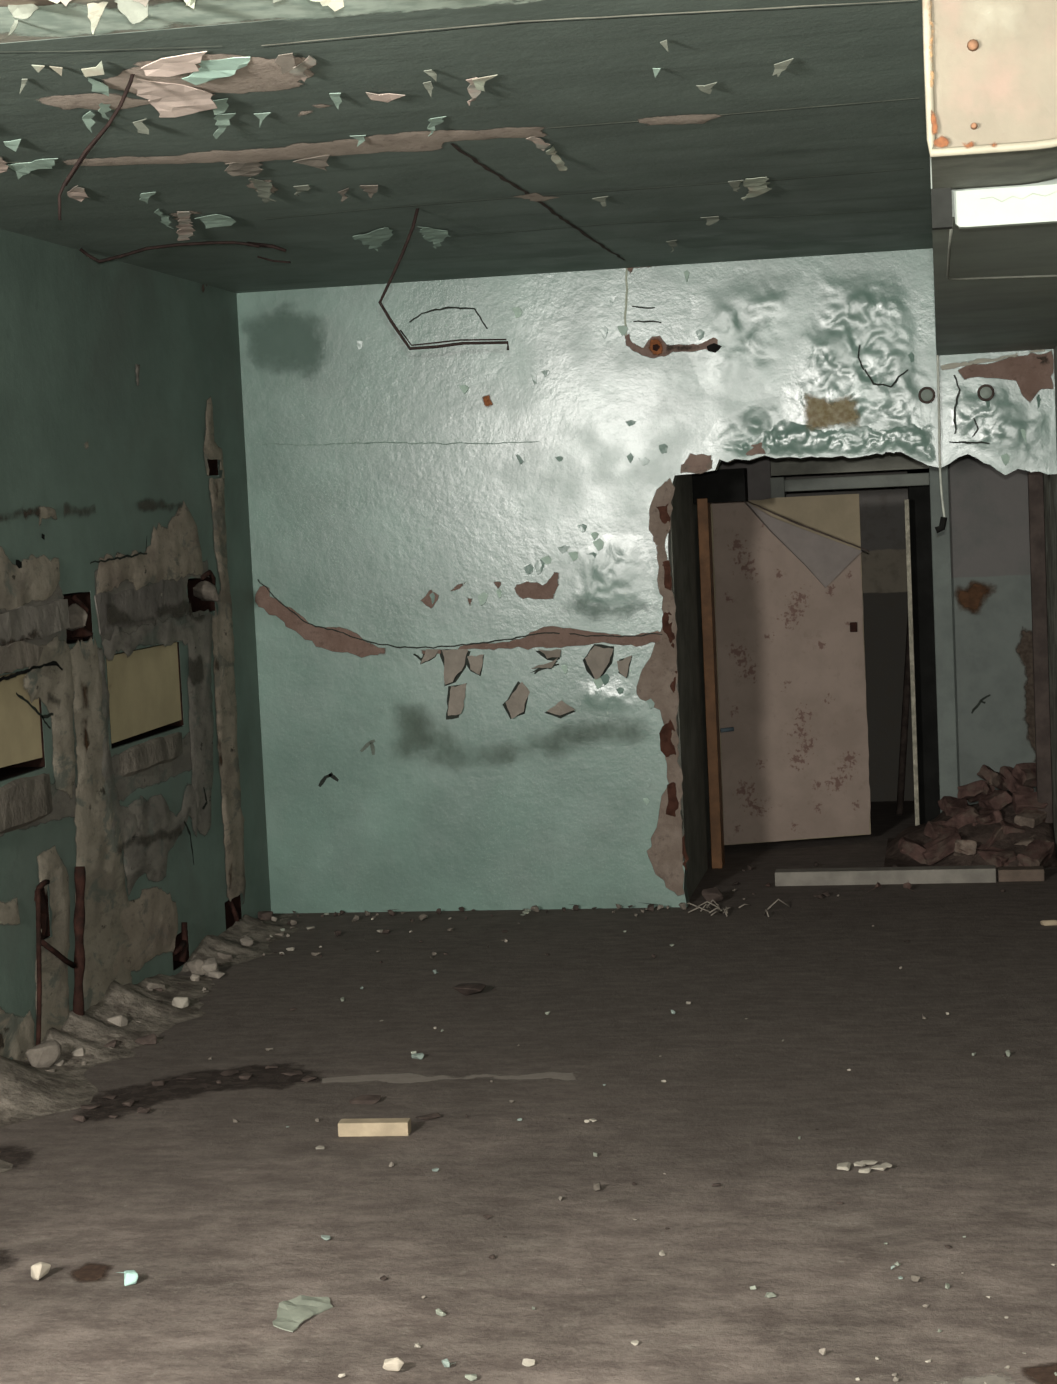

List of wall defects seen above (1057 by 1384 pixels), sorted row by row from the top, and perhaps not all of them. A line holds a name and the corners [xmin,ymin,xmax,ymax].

peeling [0,0,541,39]
peeling [0,51,568,203]
corrosion [931,111,973,148]
peeling [139,192,236,241]
peeling [352,227,393,251]
peeling [417,226,451,249]
corrosion [624,267,722,358]
flaking render [941,349,1054,408]
peeling [627,444,668,466]
flaking render [746,442,770,456]
flaking render [255,454,712,896]
flaking render [0,397,246,1061]